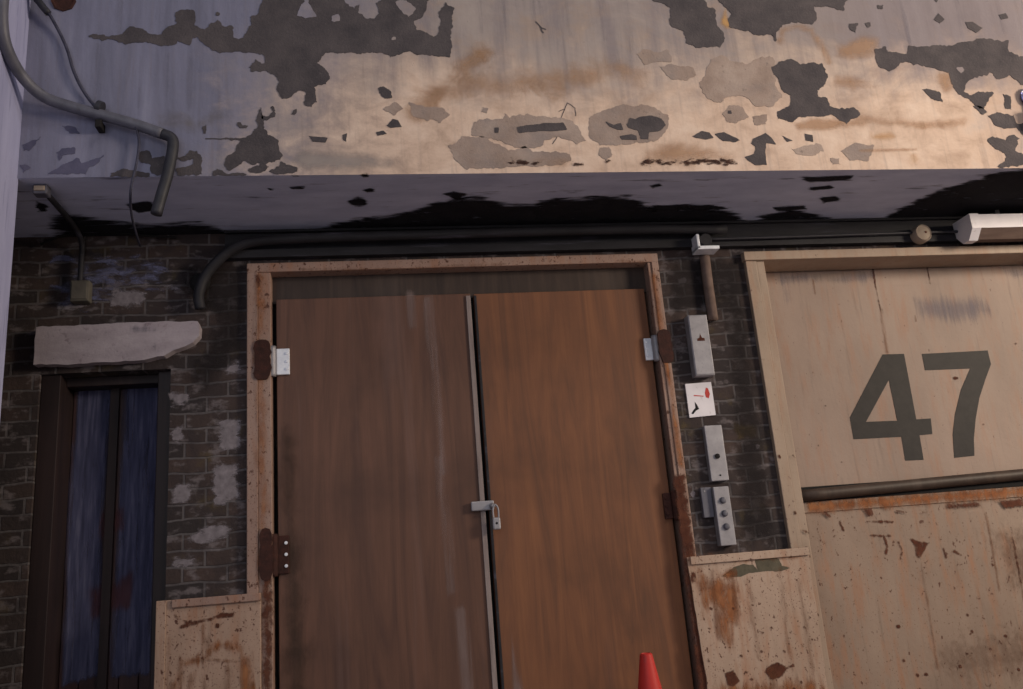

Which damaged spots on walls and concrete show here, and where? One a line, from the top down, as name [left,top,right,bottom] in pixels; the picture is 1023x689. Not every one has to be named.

spalling [51,0,76,12]
peeling [89,0,455,177]
peeling [637,0,874,165]
peeling [874,22,1023,168]
peeling [49,147,104,175]
peeling [448,104,669,170]
rust [808,487,1023,517]
rust [673,410,739,689]
rust [175,613,234,628]
rust [192,578,273,689]
rust [722,663,815,689]